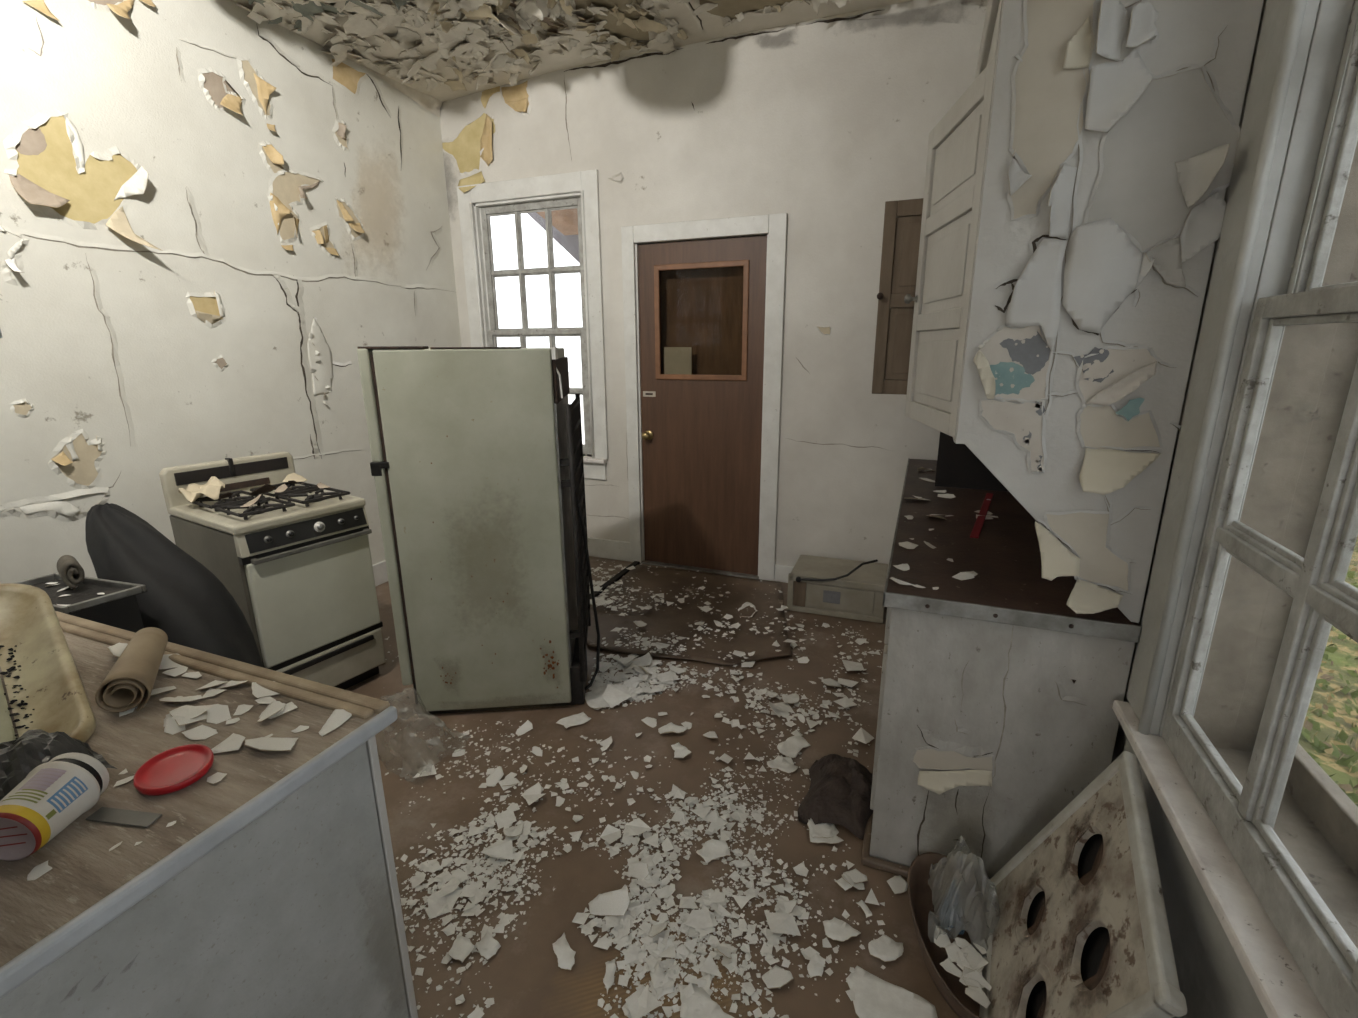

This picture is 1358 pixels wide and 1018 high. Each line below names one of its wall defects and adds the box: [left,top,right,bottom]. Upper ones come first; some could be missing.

peeling [20,0,59,21]
peeling [2,109,163,251]
peeling [79,0,156,19]
peeling [185,291,226,329]
crack [3,186,456,488]
peeling [197,56,365,261]
peeling [236,0,854,193]
crack [563,0,885,160]
peeling [973,0,1241,495]
peeling [0,429,111,522]
peeling [1035,510,1131,614]
crack [917,629,1013,867]